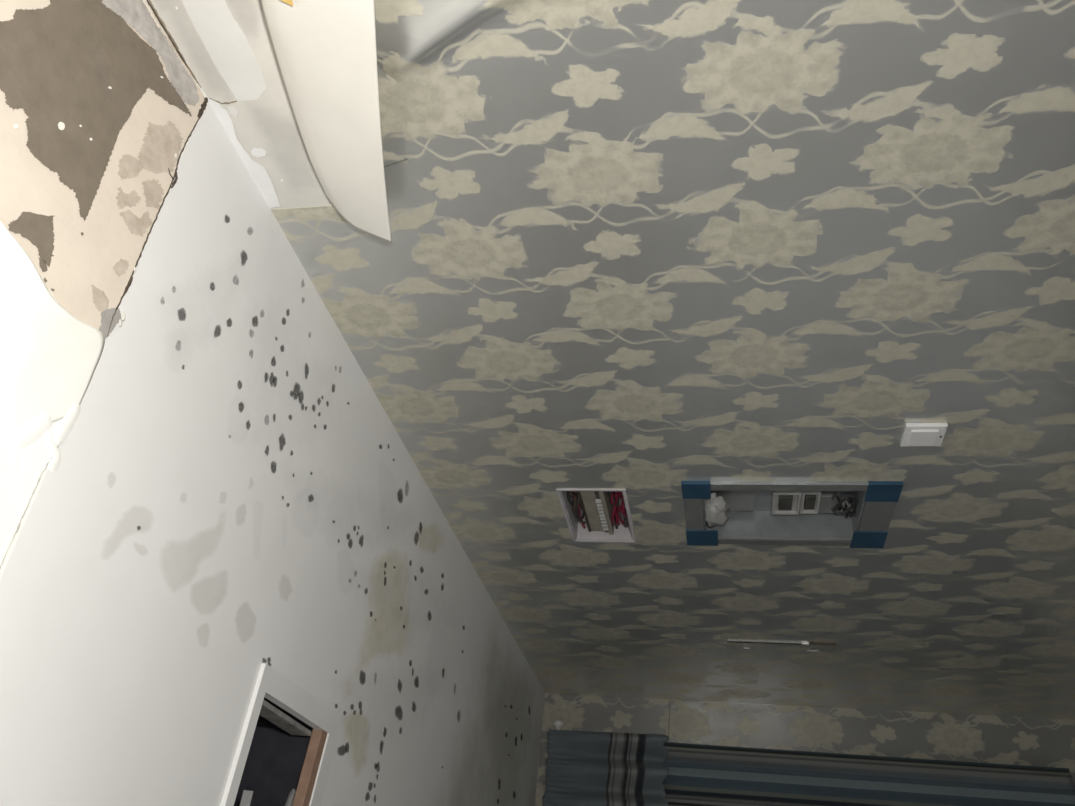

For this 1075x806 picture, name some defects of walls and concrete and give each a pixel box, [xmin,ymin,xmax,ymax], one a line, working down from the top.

flaking render [0,0,205,438]
crack [0,441,62,569]
water stain [161,308,196,378]
water stain [99,477,265,649]
water stain [225,381,253,446]
water stain [265,435,293,473]
water stain [265,337,335,429]
water stain [335,444,545,806]